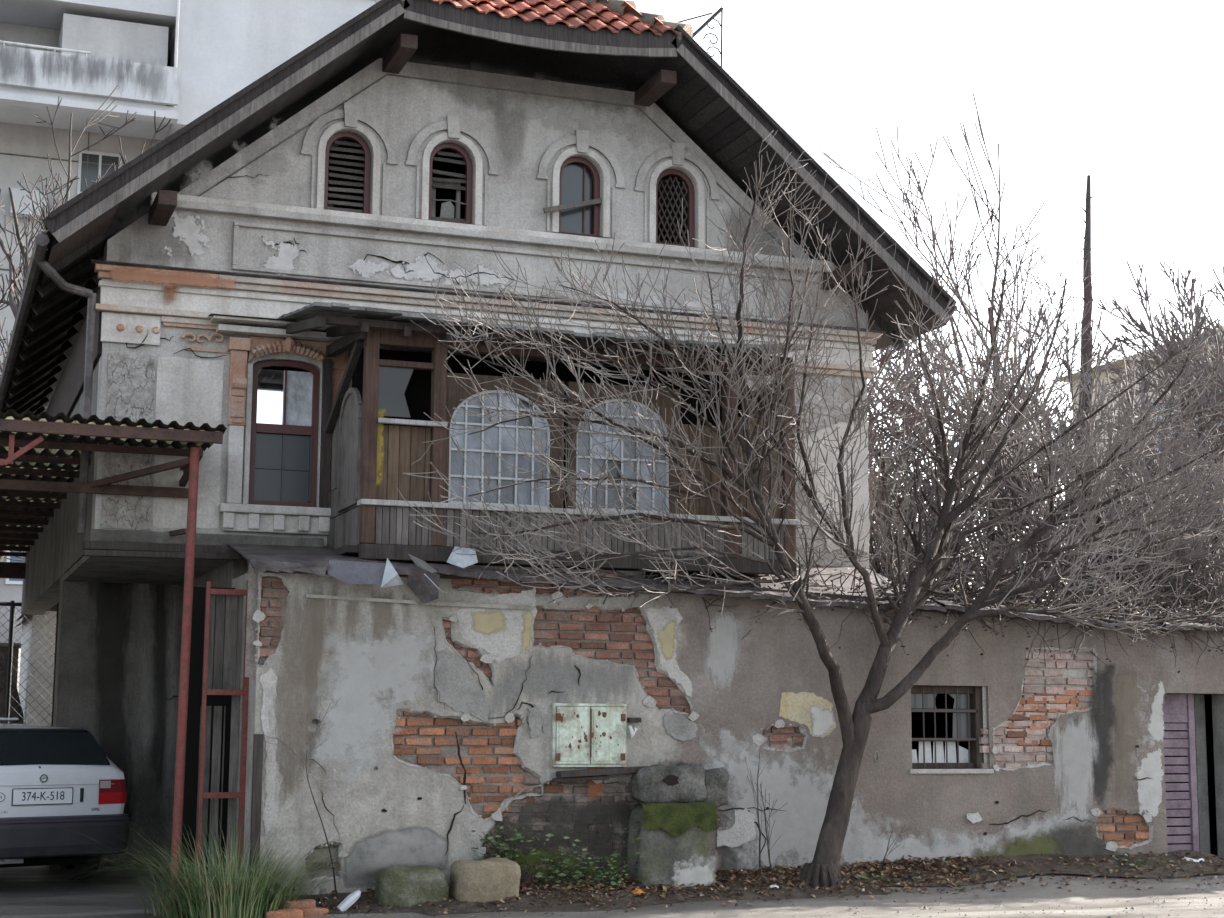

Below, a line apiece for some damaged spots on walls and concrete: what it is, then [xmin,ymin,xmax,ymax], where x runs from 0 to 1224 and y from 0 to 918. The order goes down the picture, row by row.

flaking render [262,237,299,277]
flaking render [334,255,520,296]
flaking render [245,562,293,835]
crack [431,620,483,855]
flaking render [390,708,642,881]
crack [488,655,581,730]
flaking render [442,564,699,742]
leakage [672,743,834,887]
flaking render [720,692,836,753]
leakage [842,664,1139,866]
flaking render [979,645,1098,772]
flaking render [1090,681,1165,851]